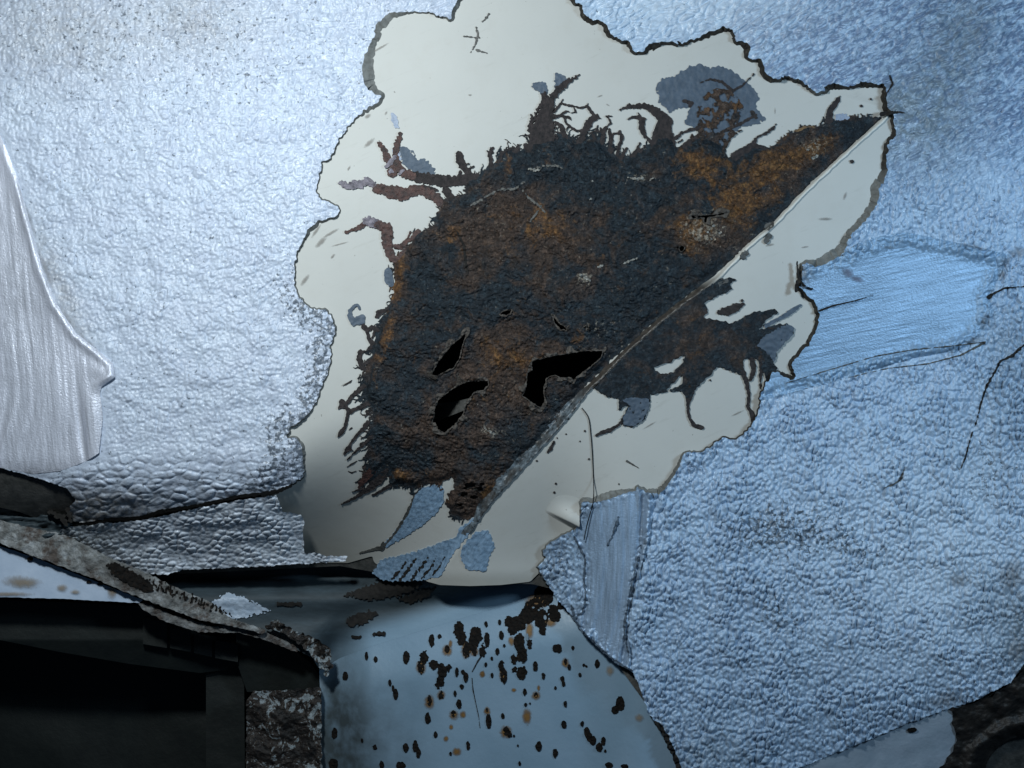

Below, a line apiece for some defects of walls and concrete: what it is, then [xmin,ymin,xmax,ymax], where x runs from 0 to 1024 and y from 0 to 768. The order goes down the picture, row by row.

peeling [261,0,892,586]
rust [338,73,882,525]
crack [795,261,873,312]
crack [987,286,1024,299]
crack [786,341,1024,468]
crack [42,485,292,529]
spalling [0,543,236,639]
rust [403,586,600,756]
rust [611,696,624,714]
rust [361,738,421,768]
rust [580,721,628,768]